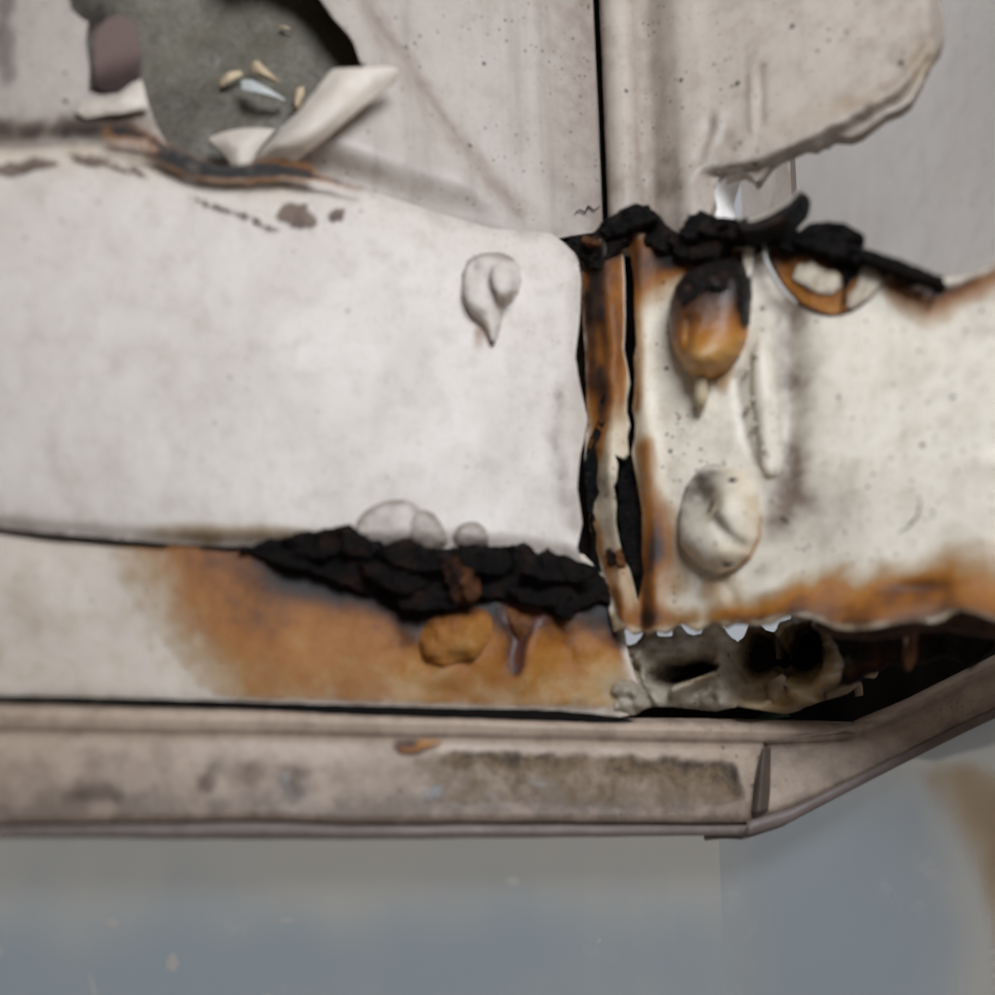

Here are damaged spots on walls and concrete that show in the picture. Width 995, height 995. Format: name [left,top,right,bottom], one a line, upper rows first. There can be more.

peeling [69,0,399,165]
peeling [0,157,58,177]
peeling [71,153,144,177]
peeling [196,197,317,230]
peeling [329,209,344,222]
peeling [743,244,885,316]
corrosion [565,189,995,460]
crack [575,256,644,600]
corrosion [137,438,995,706]
corrosion [395,739,441,752]